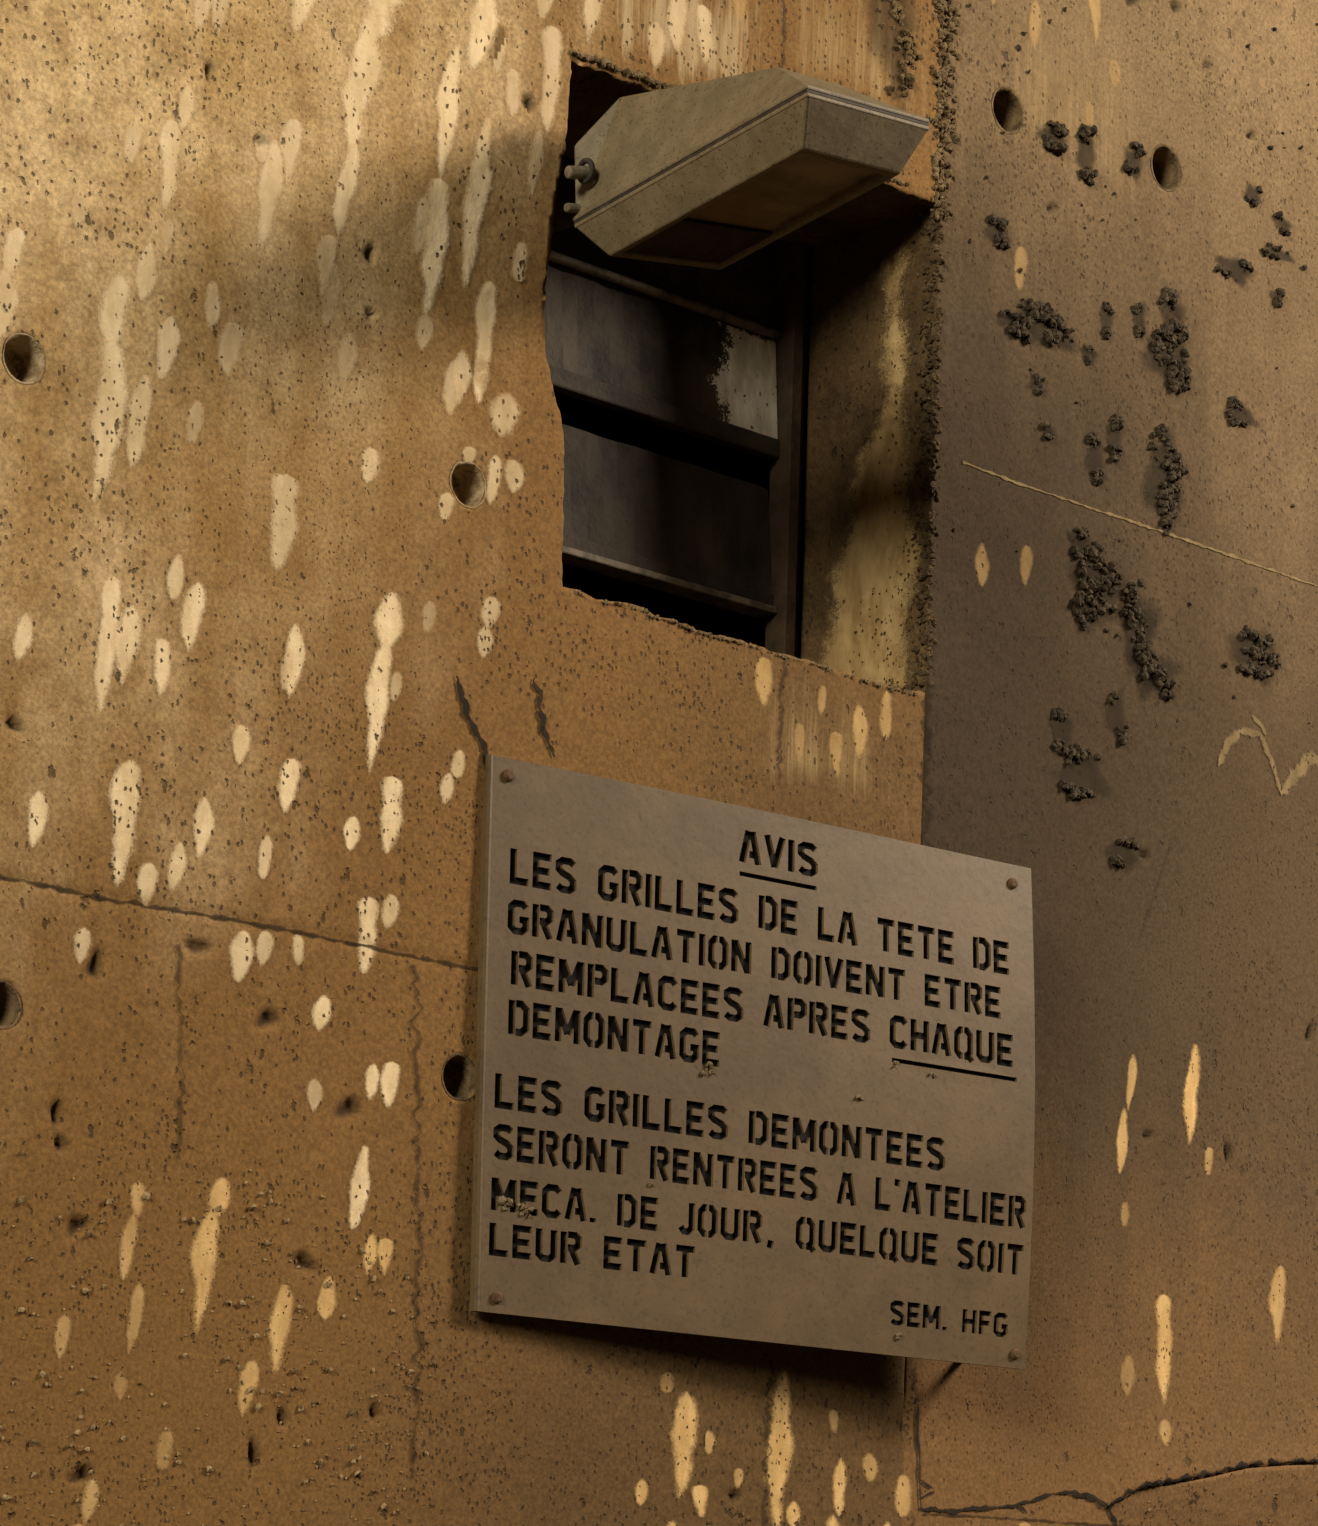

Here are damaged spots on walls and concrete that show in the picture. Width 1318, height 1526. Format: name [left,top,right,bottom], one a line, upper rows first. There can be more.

spalling [999,286,1192,396]
damp [821,249,922,753]
spalling [1069,526,1177,700]
crack [456,676,488,770]
crack [532,677,555,758]
damp [756,658,771,703]
spalling [1051,706,1110,800]
spalling [1107,691,1129,746]
crack [916,1400,1318,1525]